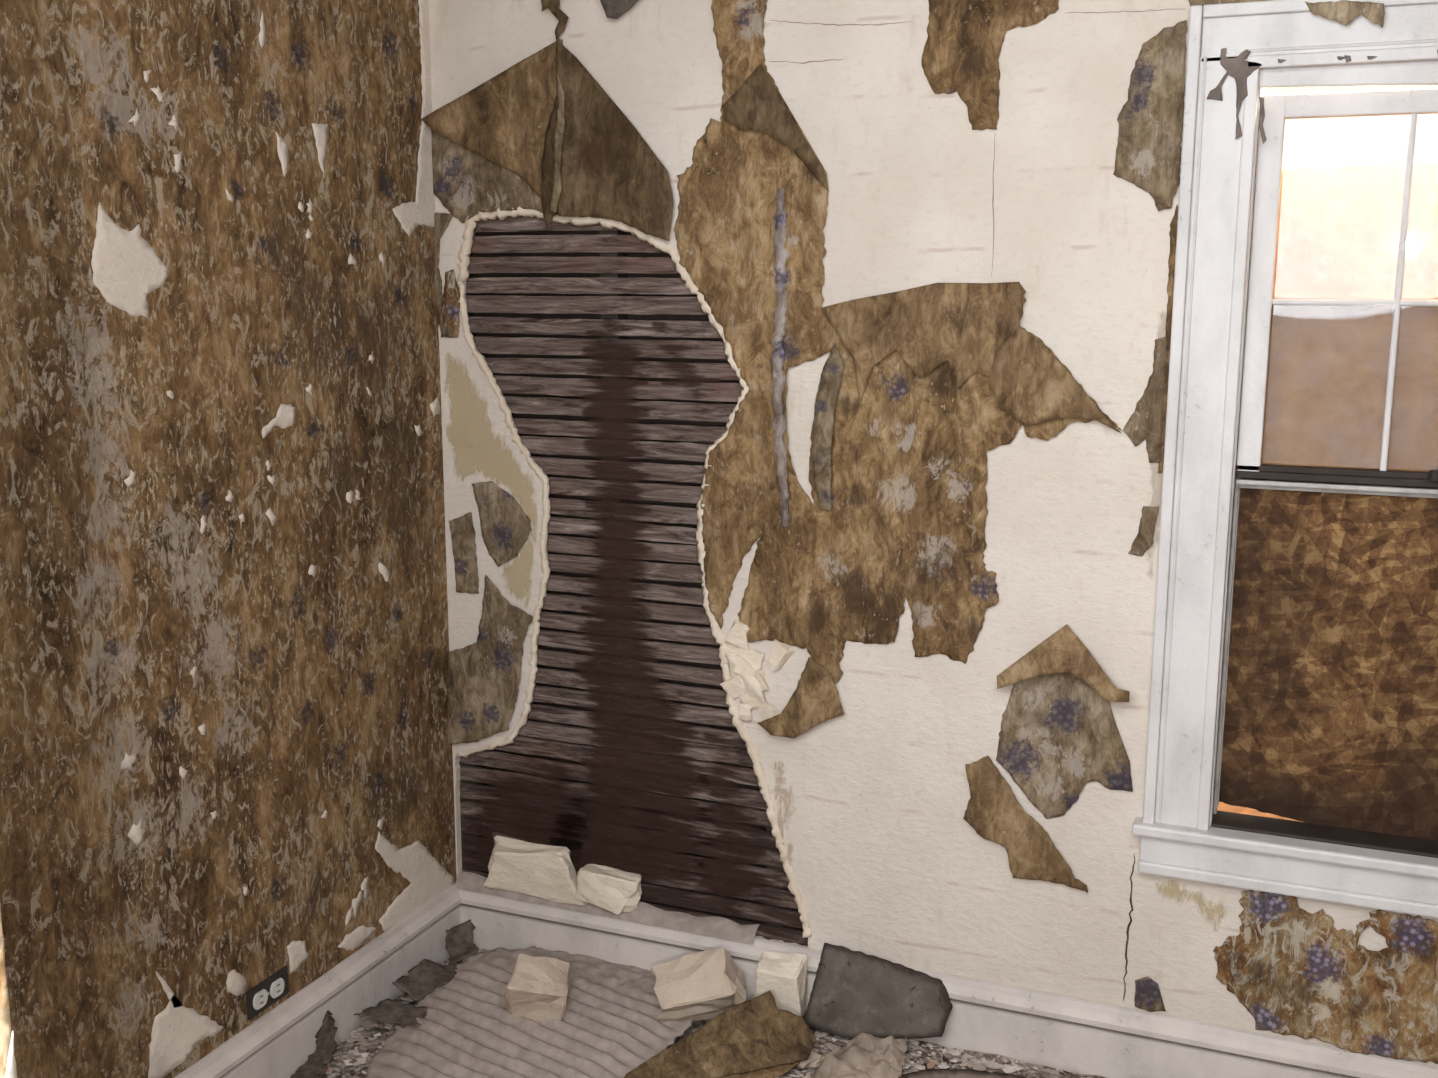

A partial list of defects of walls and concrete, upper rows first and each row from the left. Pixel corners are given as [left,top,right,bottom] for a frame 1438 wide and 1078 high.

flaking render [91,202,170,319]
flaking render [337,0,812,951]
damp [464,319,769,913]
flaking render [148,972,223,1078]
flaking render [226,969,247,996]
flaking render [287,940,309,974]
crack [1123,855,1135,1001]